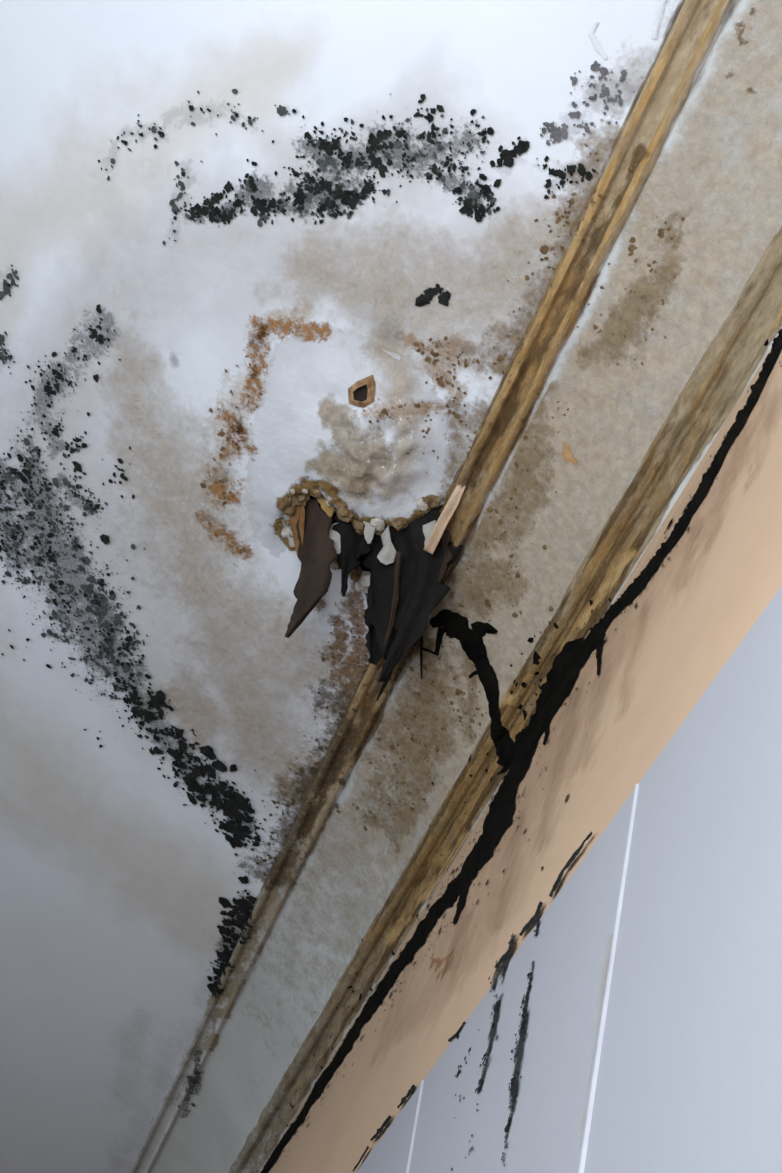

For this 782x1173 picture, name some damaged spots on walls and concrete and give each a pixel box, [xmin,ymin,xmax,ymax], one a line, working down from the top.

leakage [0,265,19,301]
leakage [98,114,164,181]
leakage [162,89,530,245]
corrosion [407,0,754,594]
leakage [305,0,782,875]
leakage [0,304,371,997]
spalling [275,484,466,701]
corrosion [196,227,782,1173]
crack [257,329,782,1173]
leakage [501,961,534,1166]
leakage [455,831,592,1111]